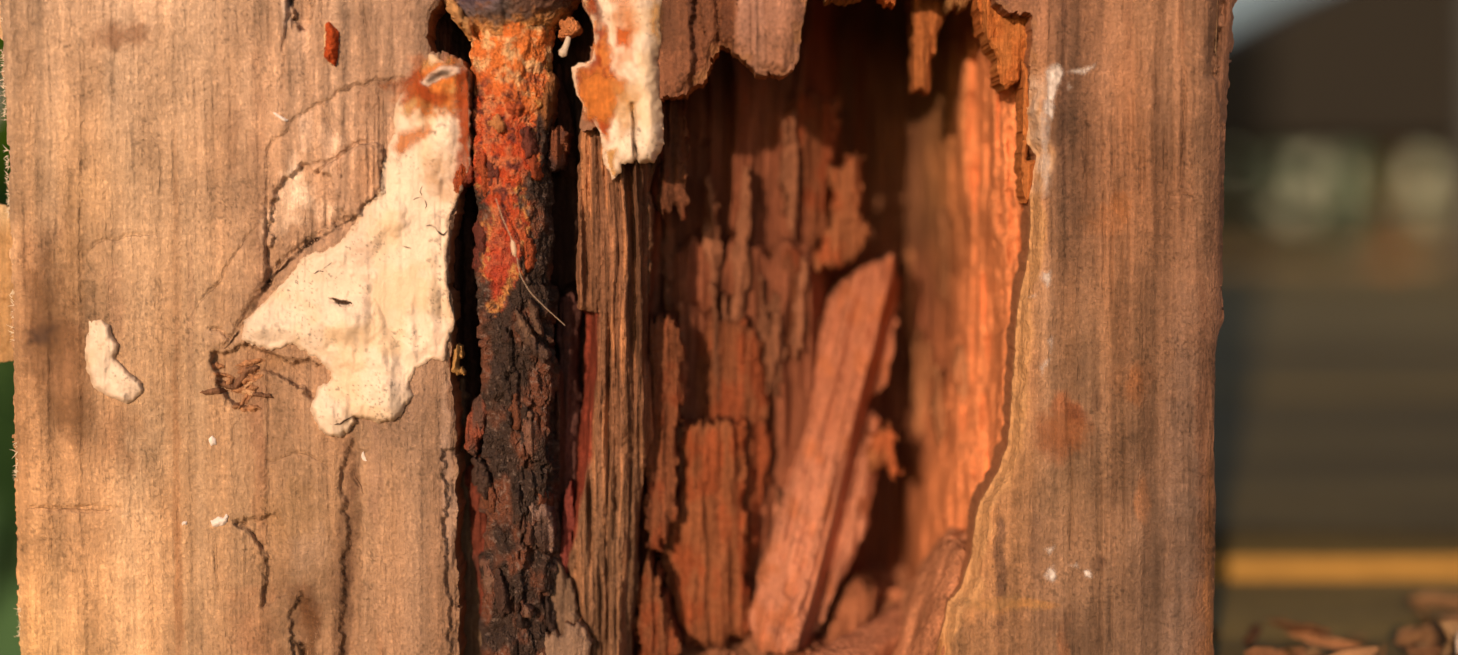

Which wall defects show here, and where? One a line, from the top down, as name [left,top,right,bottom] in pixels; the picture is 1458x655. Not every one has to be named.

peeling [428,54,468,70]
peeling [571,0,665,180]
peeling [199,83,471,438]
rust [472,219,486,273]
rust [519,231,537,273]
peeling [85,320,144,404]
rust [513,297,552,364]
rust [464,391,558,553]